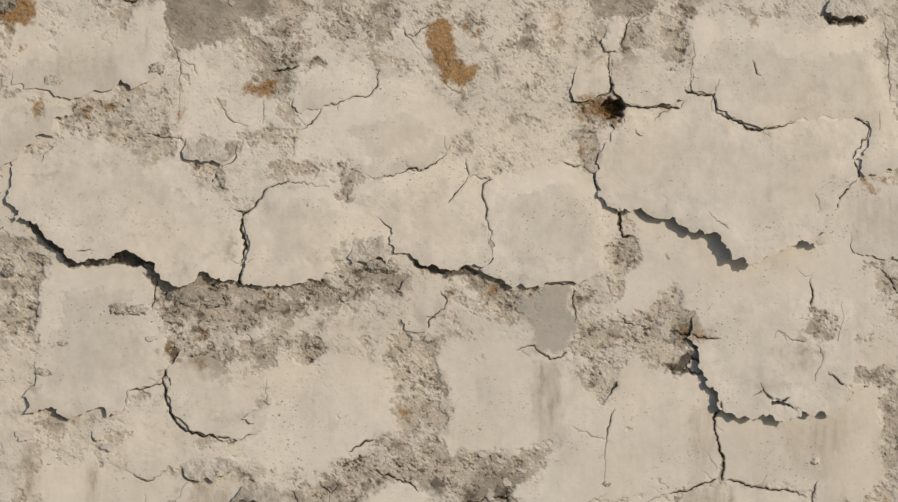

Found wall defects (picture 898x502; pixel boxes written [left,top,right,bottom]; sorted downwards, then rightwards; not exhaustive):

corrosion [0,0,36,32]
corrosion [425,18,479,86]
peeling [570,0,898,266]
crack [200,181,327,308]
peeling [0,0,639,441]
crack [384,137,492,241]
spalling [875,259,898,320]
crack [124,371,248,443]
spalling [180,292,524,502]
peeling [567,282,898,502]
crack [653,403,817,502]
crack [755,385,797,409]